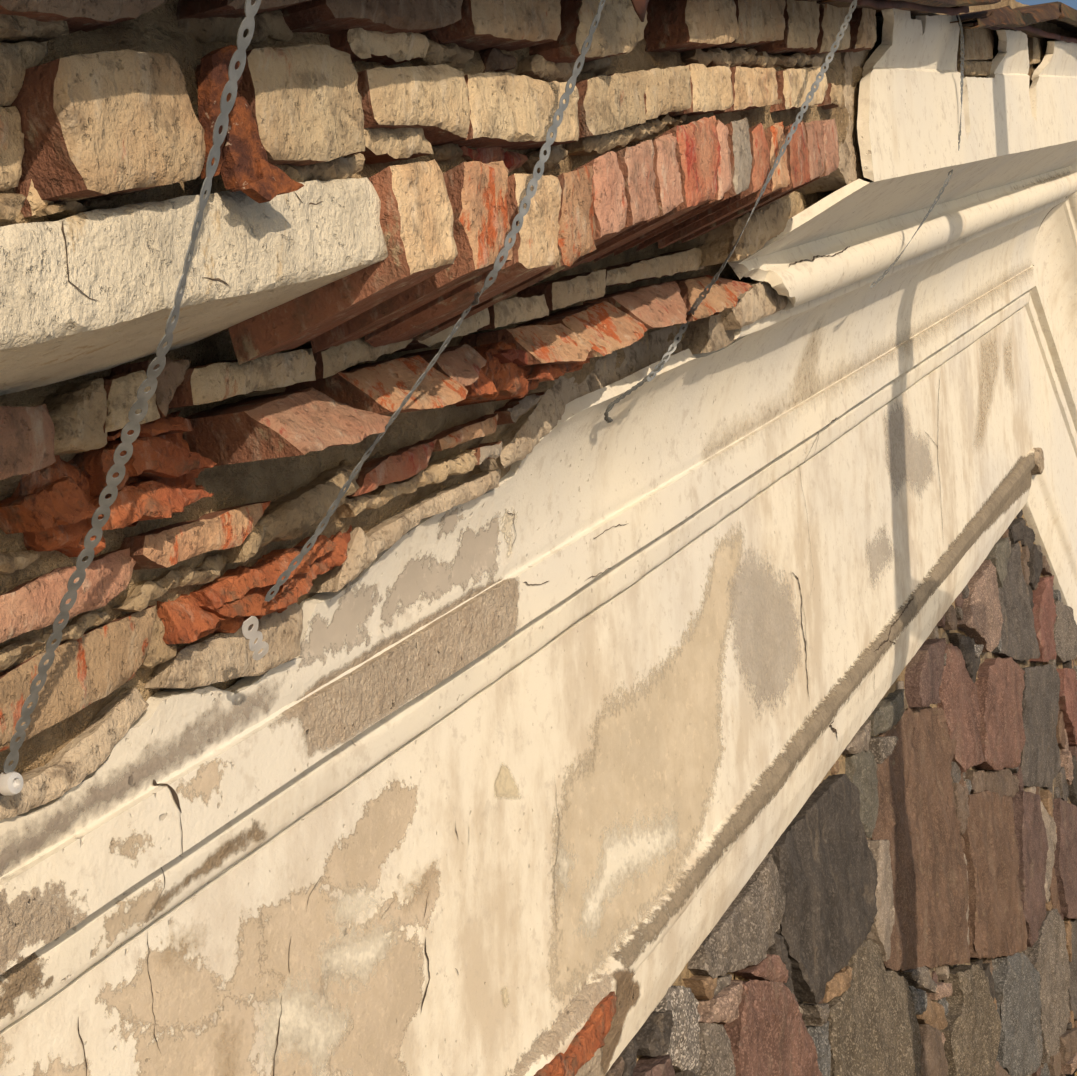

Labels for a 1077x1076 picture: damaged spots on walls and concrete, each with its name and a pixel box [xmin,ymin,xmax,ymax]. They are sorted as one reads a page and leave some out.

crack [789,246,850,265]
flaking render [0,0,884,820]
peeling [510,527,743,1076]
flaking render [0,880,87,974]
crack [147,780,183,1053]
peeling [92,780,440,1076]
peeling [34,1057,90,1076]
crack [78,1018,87,1076]
crack [273,997,282,1076]